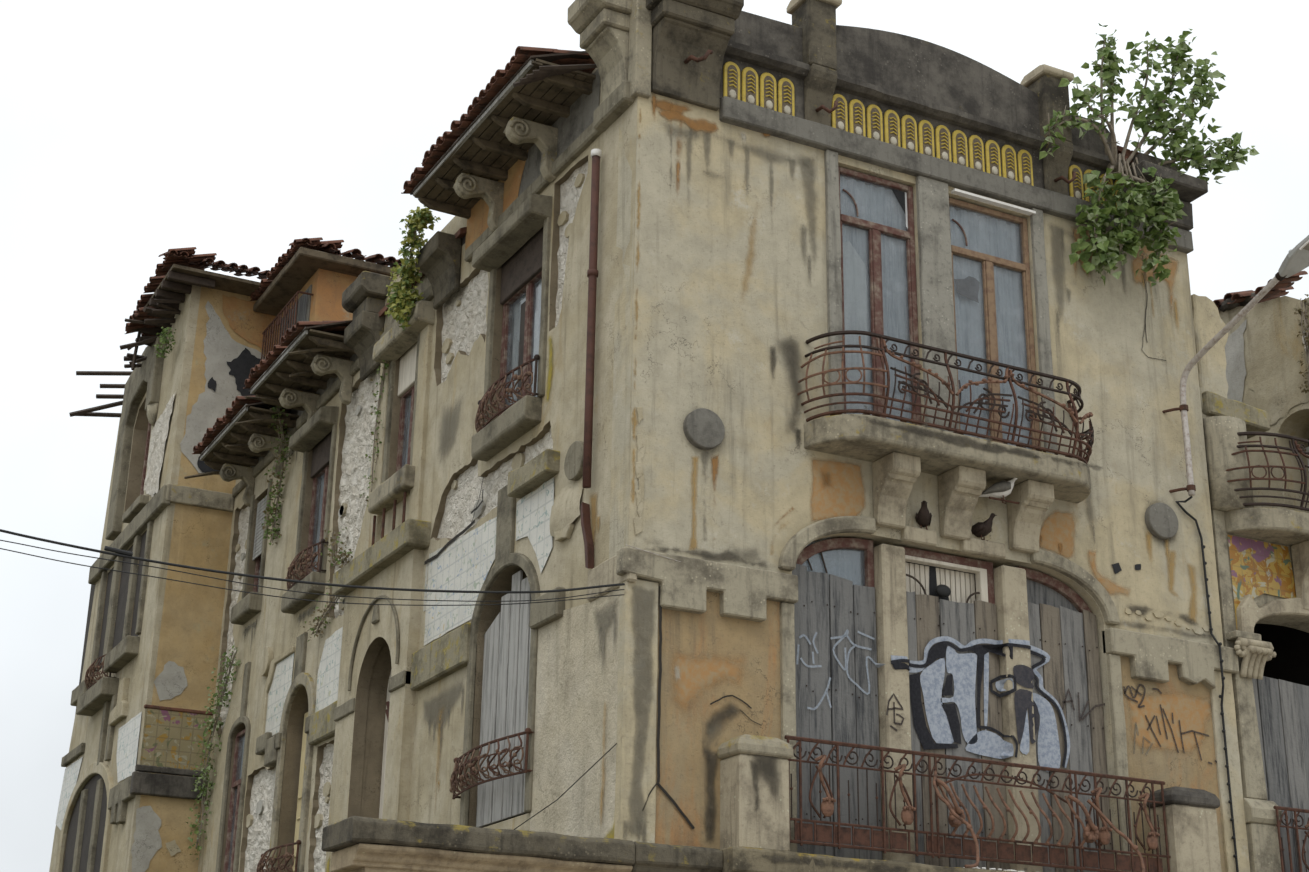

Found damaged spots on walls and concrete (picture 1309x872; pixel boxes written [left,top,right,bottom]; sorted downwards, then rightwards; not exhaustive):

spalling [555,161,588,327]
corrosion [652,95,718,132]
damp [671,128,709,178]
damp [730,136,815,271]
flaking render [143,301,263,497]
spalling [441,270,489,383]
flaking render [1225,319,1309,425]
spalling [335,365,381,572]
corrosion [690,452,718,548]
spalling [334,596,345,618]
peeling [1129,694,1211,752]
spalling [244,766,276,872]